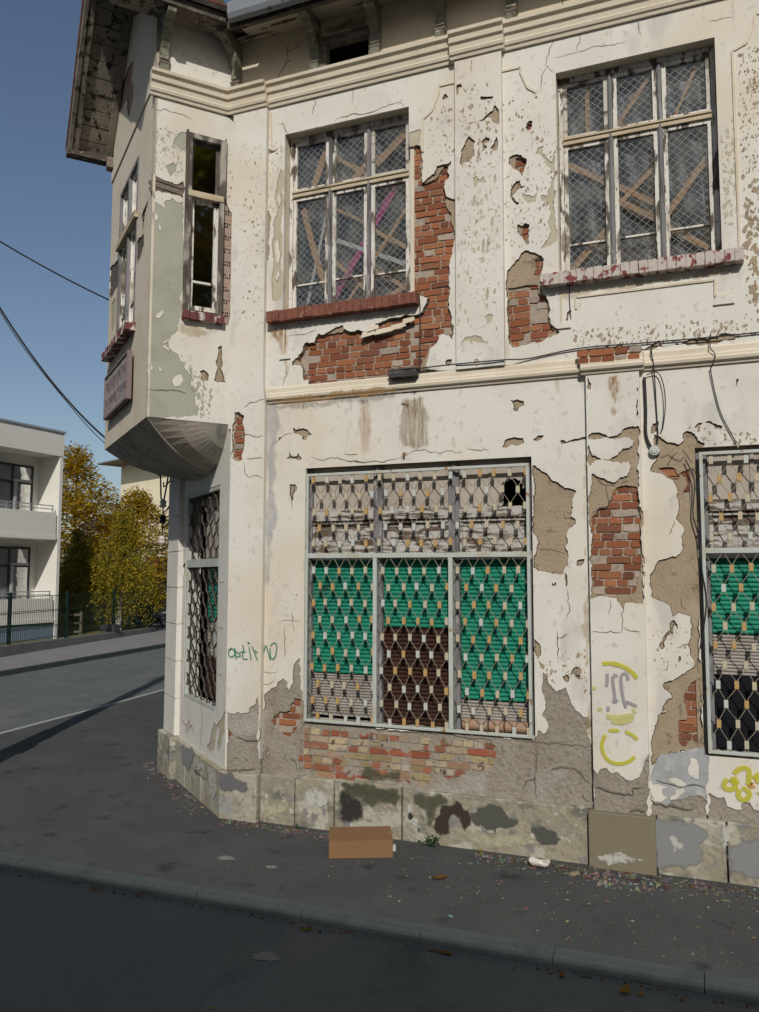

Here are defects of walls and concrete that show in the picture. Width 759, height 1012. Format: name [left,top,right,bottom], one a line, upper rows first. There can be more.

peeling [153,127,186,176]
peeling [142,197,223,419]
flaking render [294,83,559,384]
flaking render [573,47,759,365]
flaking render [207,389,759,823]
water stain [305,782,560,848]